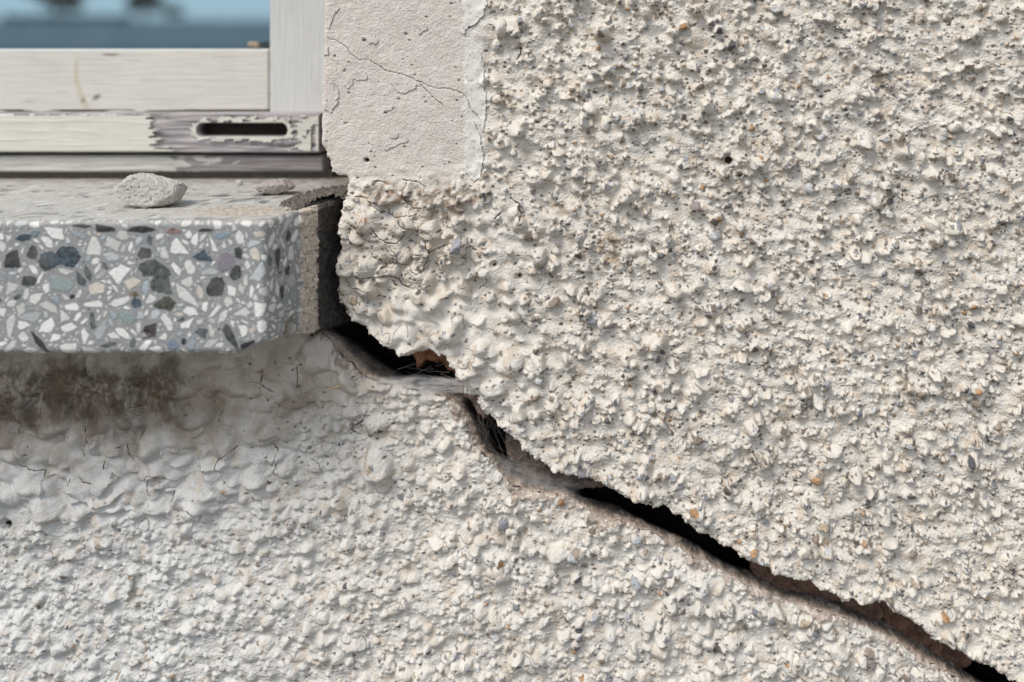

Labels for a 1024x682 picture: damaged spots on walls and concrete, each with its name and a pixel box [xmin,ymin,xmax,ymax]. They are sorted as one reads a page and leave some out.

crack [331,39,477,115]
crack [348,179,476,289]
damp [0,366,180,424]
crack [311,321,998,682]